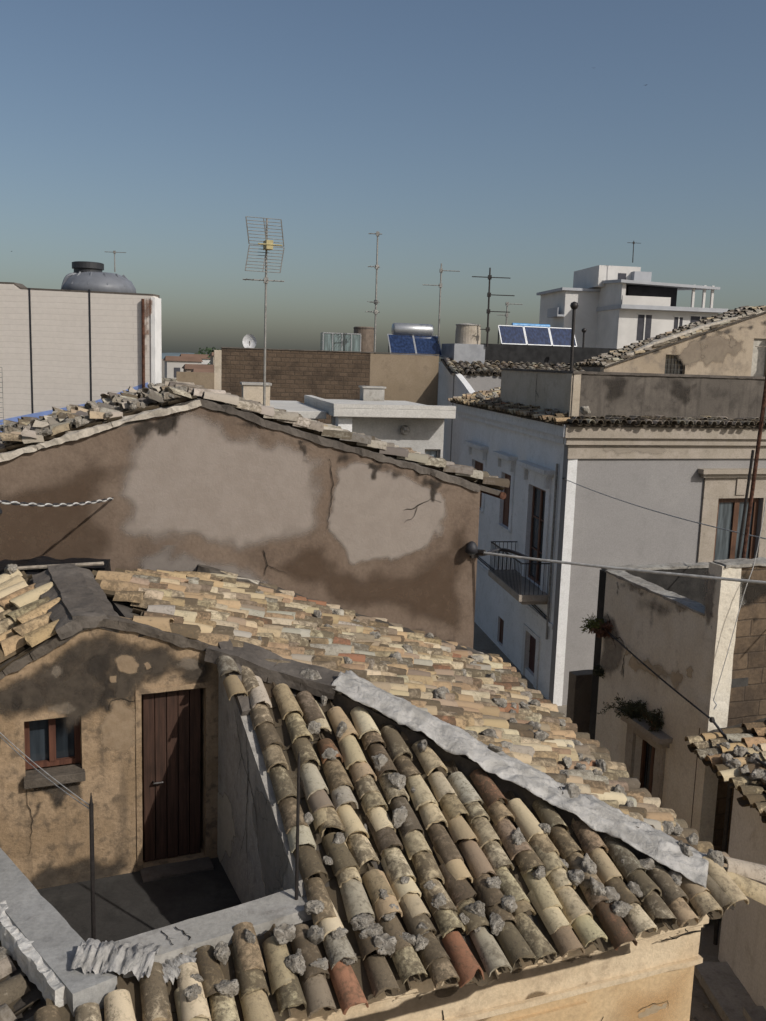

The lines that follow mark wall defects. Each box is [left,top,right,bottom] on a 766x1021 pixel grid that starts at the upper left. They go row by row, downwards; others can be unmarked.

damp [89,654,114,712]
damp [34,782,81,806]